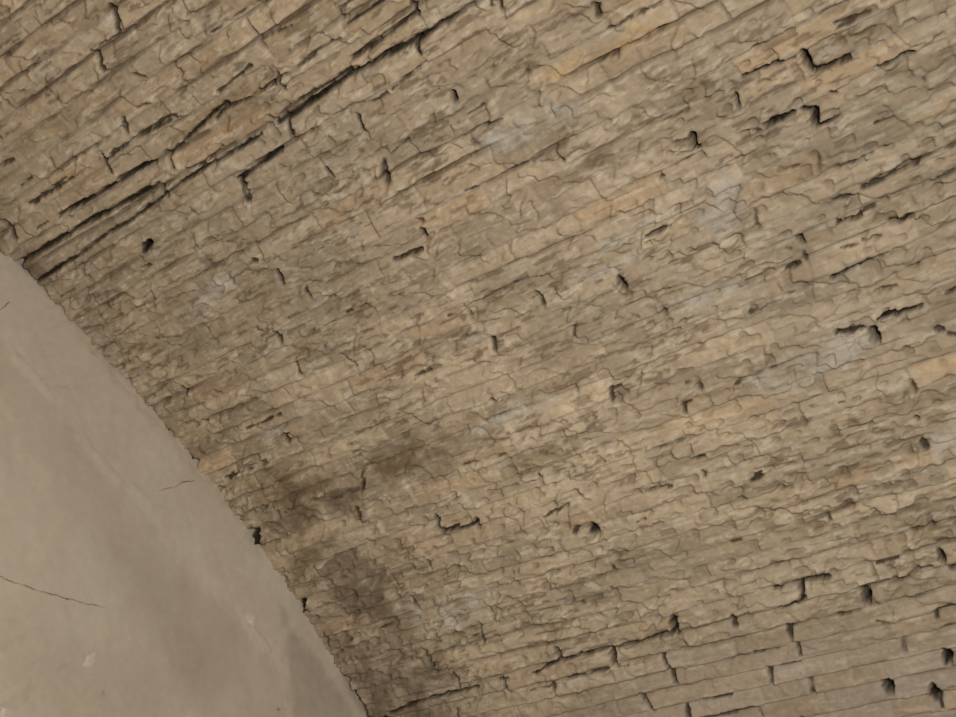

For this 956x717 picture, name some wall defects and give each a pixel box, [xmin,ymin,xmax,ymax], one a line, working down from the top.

crack [0,576,101,607]
damp [0,317,356,717]
damp [405,585,497,641]
damp [229,159,756,595]